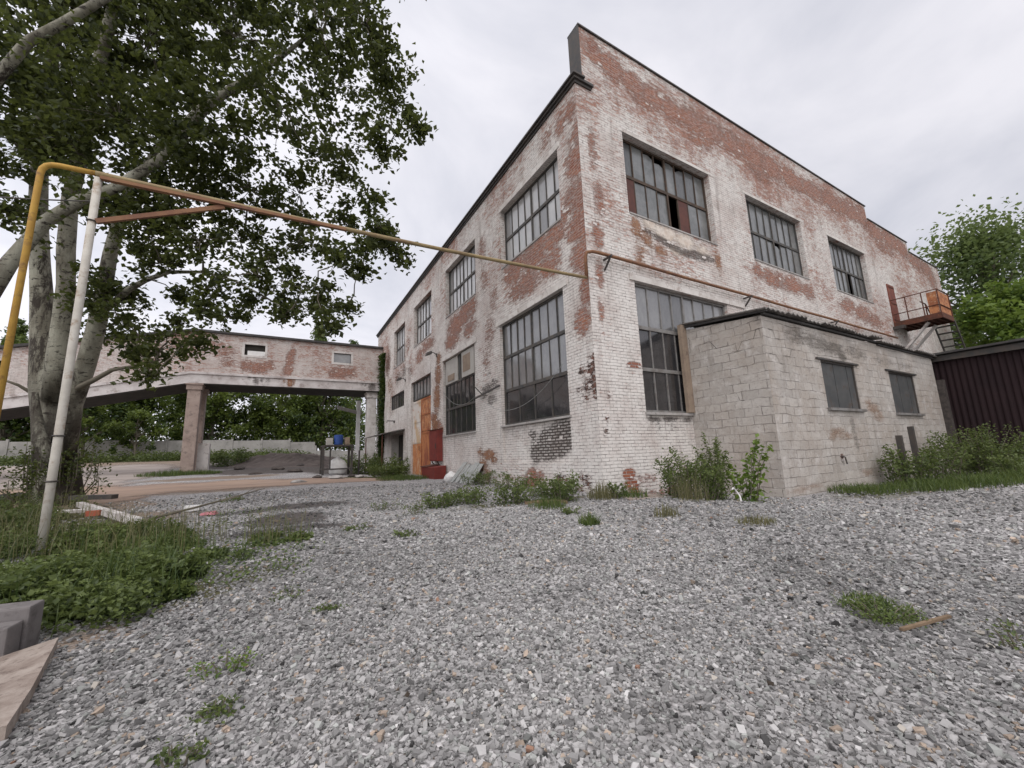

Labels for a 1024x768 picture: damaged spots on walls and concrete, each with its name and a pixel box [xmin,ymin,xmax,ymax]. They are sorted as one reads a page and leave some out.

peeling [584,38,938,289]
peeling [405,100,606,373]
peeling [752,262,816,300]
peeling [836,296,883,331]
peeling [208,340,297,375]
peeling [329,366,355,379]
spalling [576,352,613,401]
spalling [524,419,592,493]
peeling [623,468,674,494]